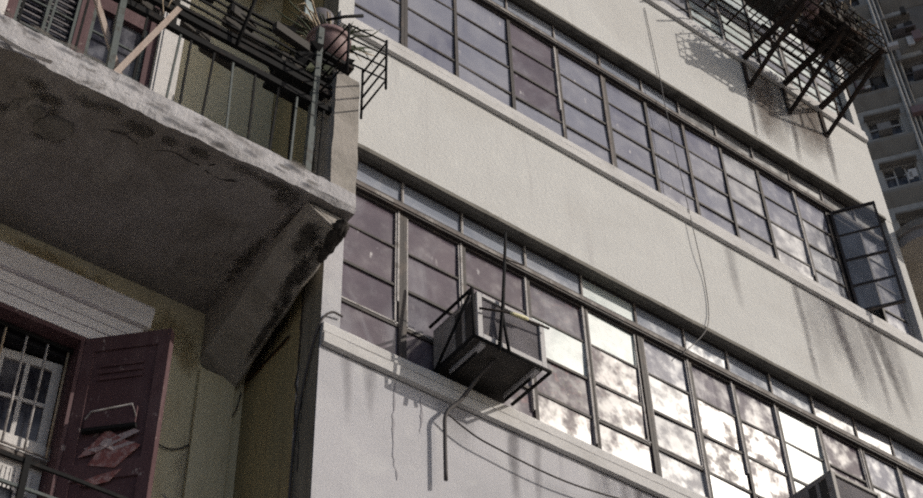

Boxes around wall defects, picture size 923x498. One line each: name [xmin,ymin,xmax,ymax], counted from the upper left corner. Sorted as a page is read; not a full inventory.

damp [748,70,779,121]
damp [787,93,831,154]
damp [251,313,289,370]
damp [869,326,896,381]
crack [391,382,399,480]